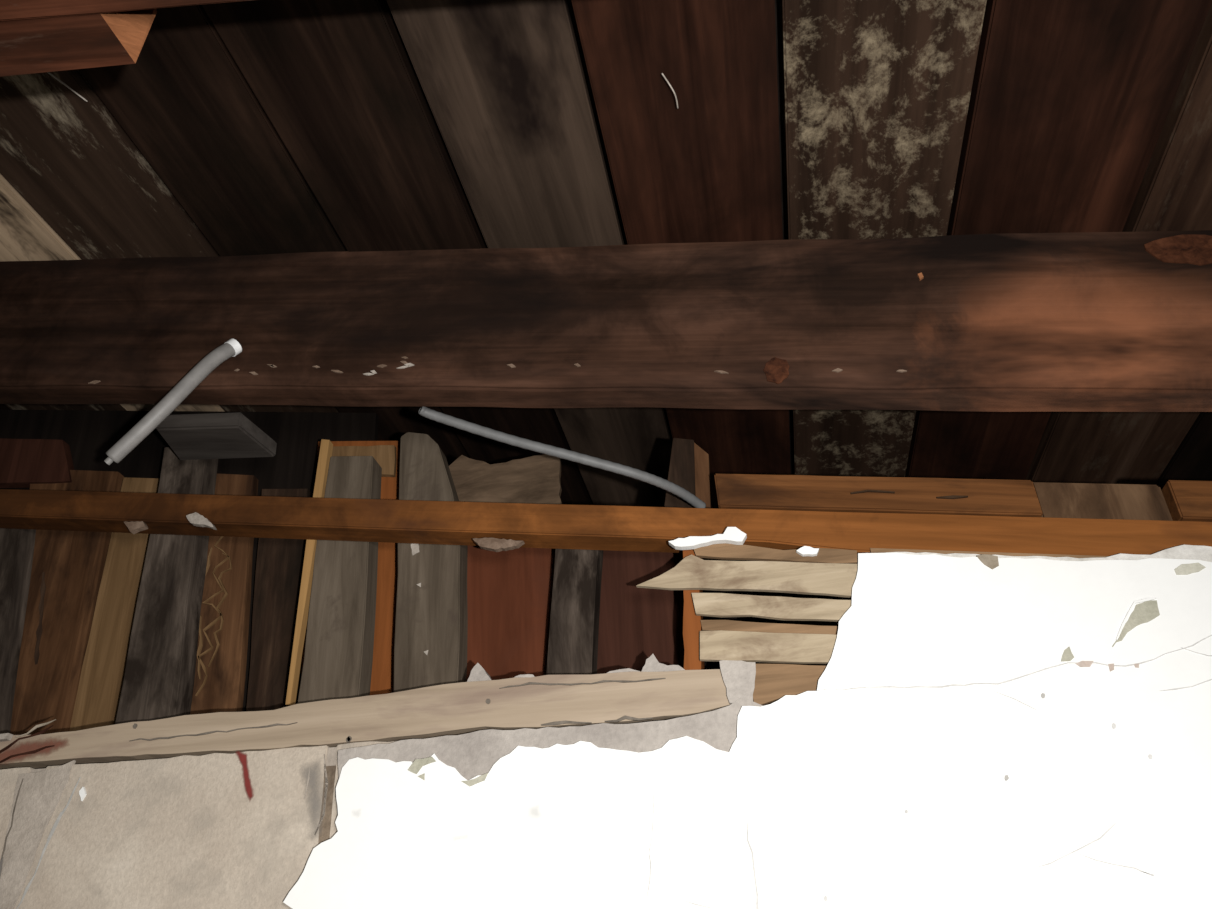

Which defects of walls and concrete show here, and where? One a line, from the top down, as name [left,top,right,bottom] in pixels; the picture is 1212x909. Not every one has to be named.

flaking render [473,538,525,552]
flaking render [668,527,747,550]
flaking render [796,546,819,557]
flaking render [1174,563,1206,575]
flaking render [1112,597,1160,647]
flaking render [1061,647,1093,667]
crack [817,635,1212,710]
flaking render [408,757,436,780]
flaking render [461,773,488,786]